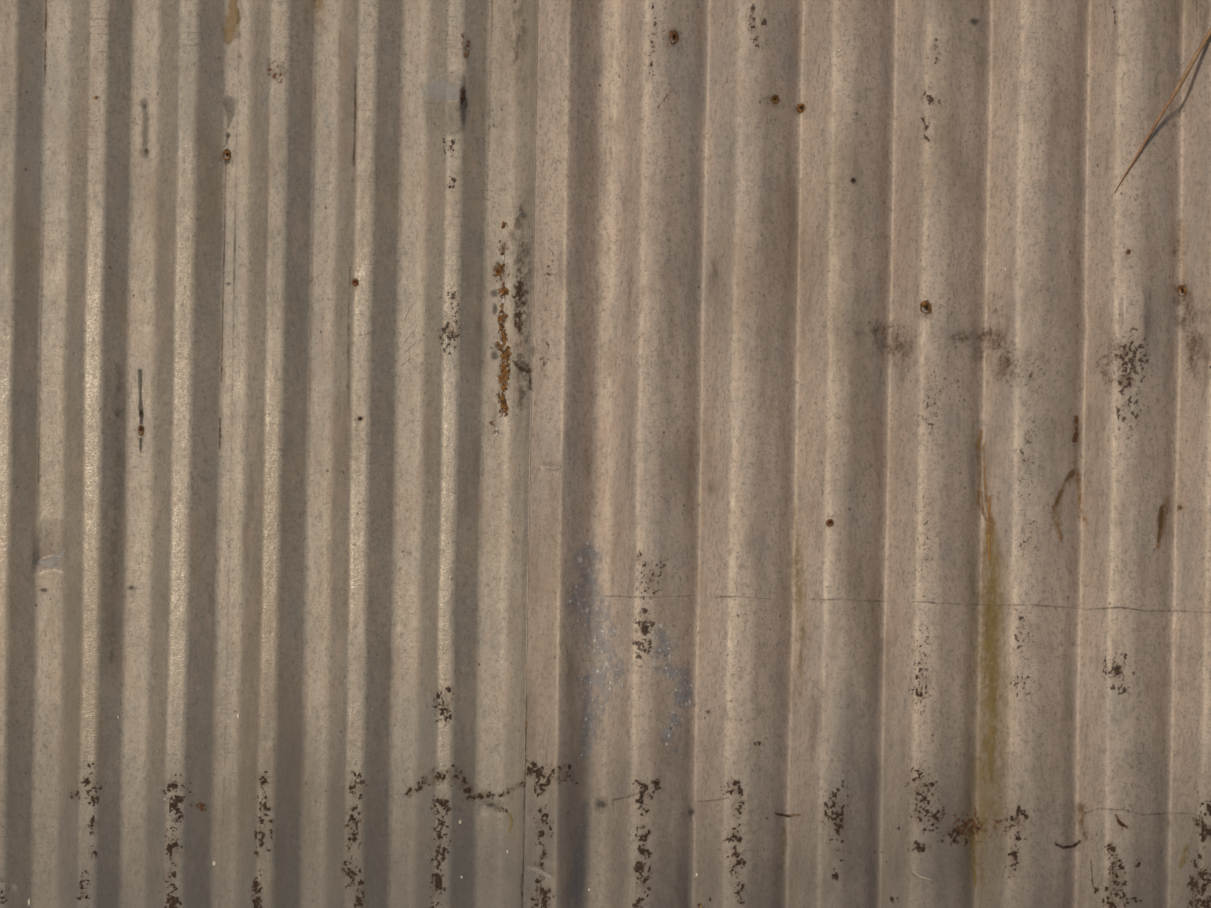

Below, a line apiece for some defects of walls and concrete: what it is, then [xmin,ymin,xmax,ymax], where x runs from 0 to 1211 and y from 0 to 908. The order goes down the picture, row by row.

corrosion [490,221,511,436]
corrosion [1114,328,1148,421]
corrosion [405,541,694,908]
corrosion [70,763,102,835]
corrosion [163,774,205,908]
corrosion [252,874,262,908]
corrosion [254,771,272,854]
corrosion [721,781,746,904]
corrosion [824,780,849,843]
corrosion [1091,844,1142,908]